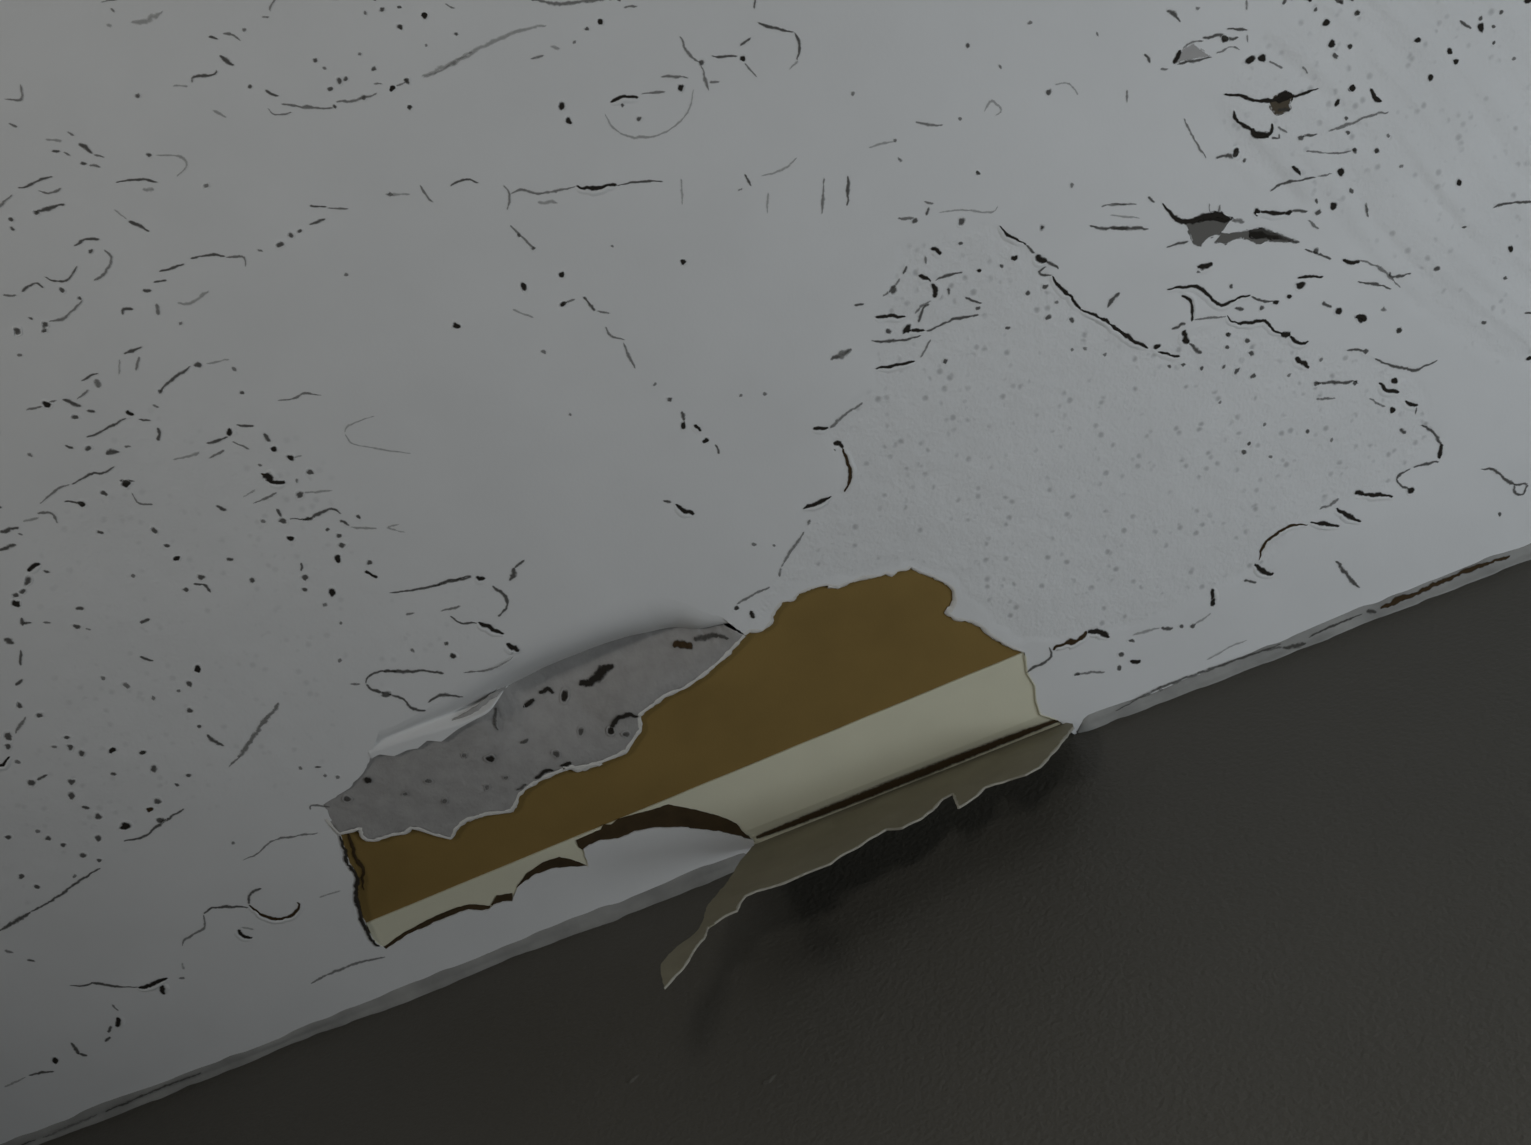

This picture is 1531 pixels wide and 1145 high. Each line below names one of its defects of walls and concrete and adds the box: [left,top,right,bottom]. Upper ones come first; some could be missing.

crack [1167,0,1308,73]
crack [1184,111,1368,229]
flaking render [1148,197,1360,265]
flaking render [855,215,1005,373]
flaking render [1177,330,1202,354]
flaking render [1291,357,1309,371]
crack [996,226,1447,630]
crack [259,508,524,711]
flaking render [324,403,862,842]
crack [1027,629,1110,672]
crack [1116,555,1510,711]
spalling [1336,561,1360,588]